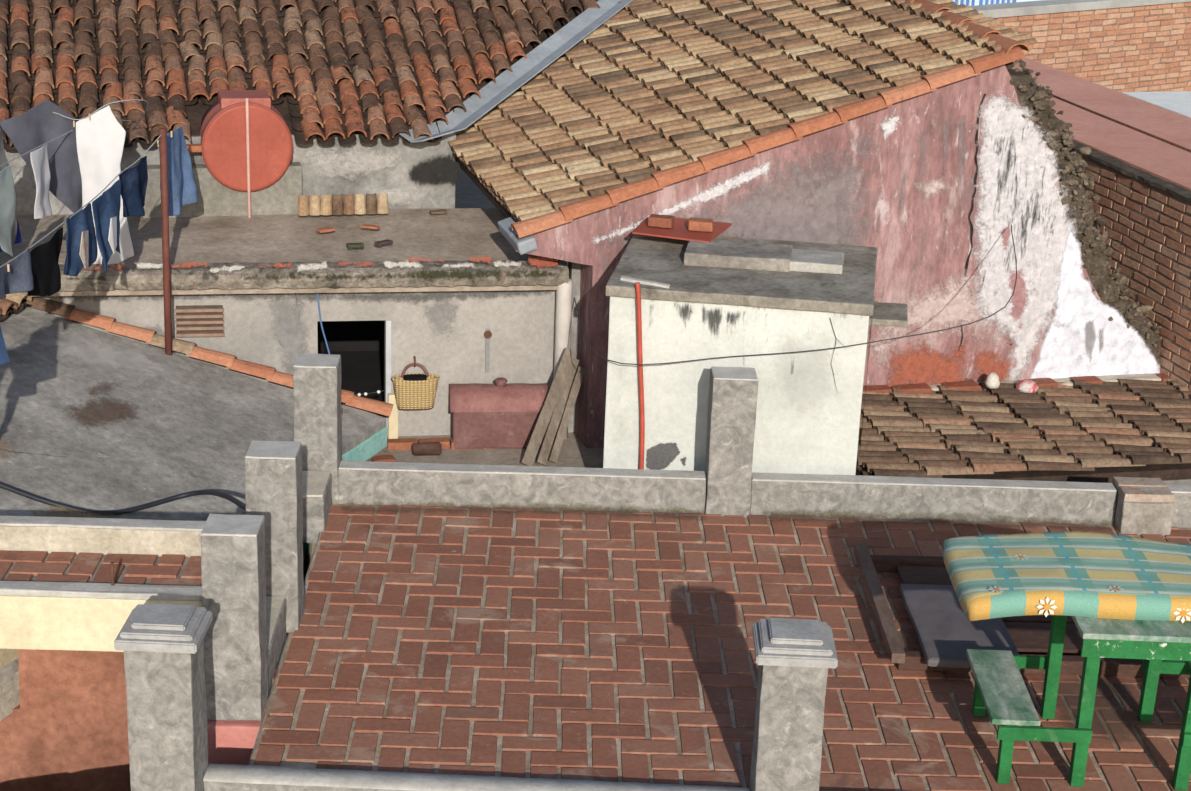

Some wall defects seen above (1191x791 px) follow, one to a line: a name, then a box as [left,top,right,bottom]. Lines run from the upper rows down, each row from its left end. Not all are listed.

peeling [594,162,770,244]
water stain [680,305,739,334]
crack [959,94,986,357]
peeling [871,97,1160,387]